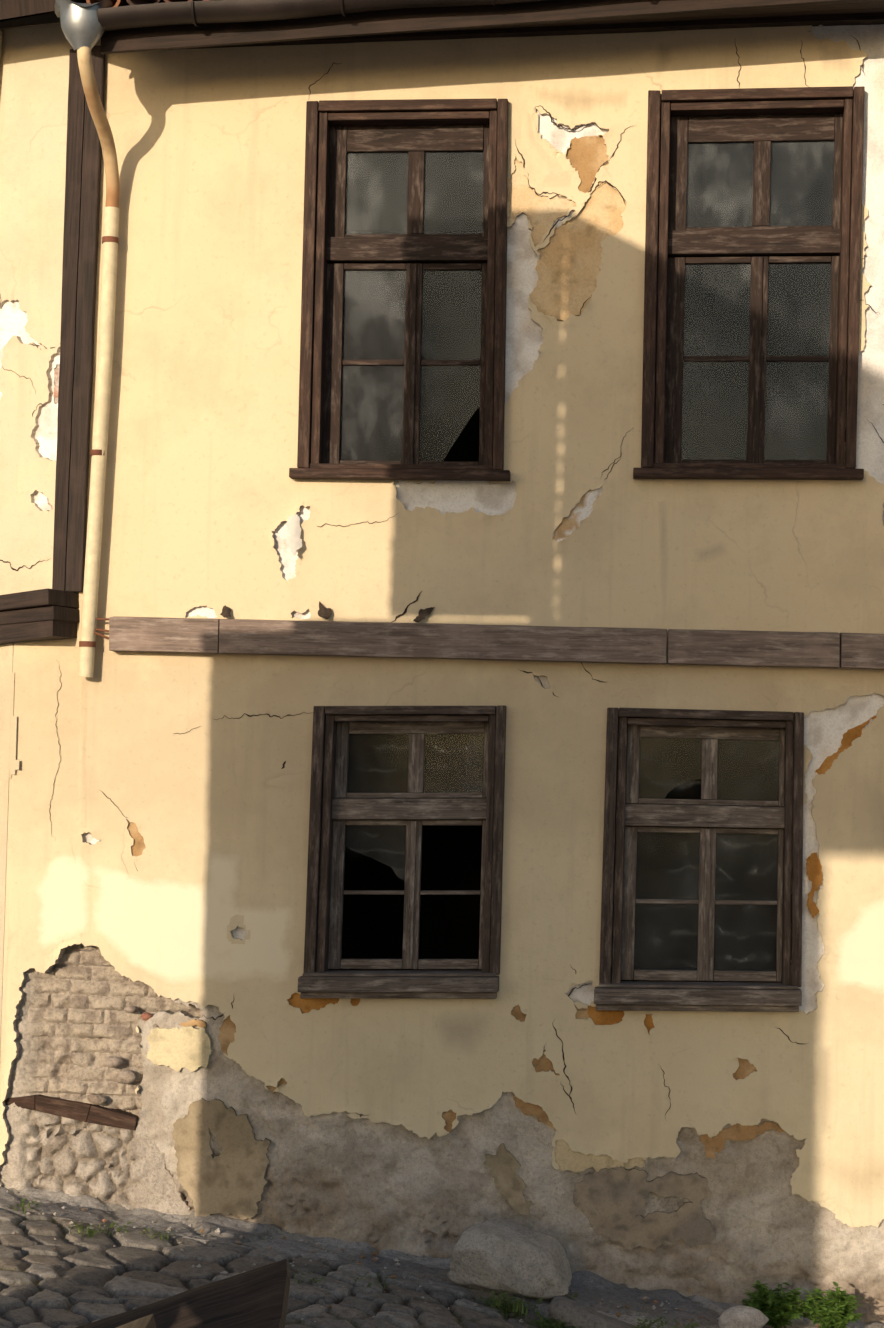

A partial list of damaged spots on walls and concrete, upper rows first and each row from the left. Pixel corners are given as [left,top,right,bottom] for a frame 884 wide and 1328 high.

peeling [505,110,627,403]
flaking render [811,24,884,484]
flaking render [0,301,42,368]
flaking render [35,354,60,461]
flaking render [34,492,53,511]
flaking render [273,506,310,581]
flaking render [394,480,517,515]
peeling [553,486,602,542]
crack [174,712,313,734]
flaking render [799,693,884,1014]
crack [552,967,588,1114]
spalling [0,944,884,1324]